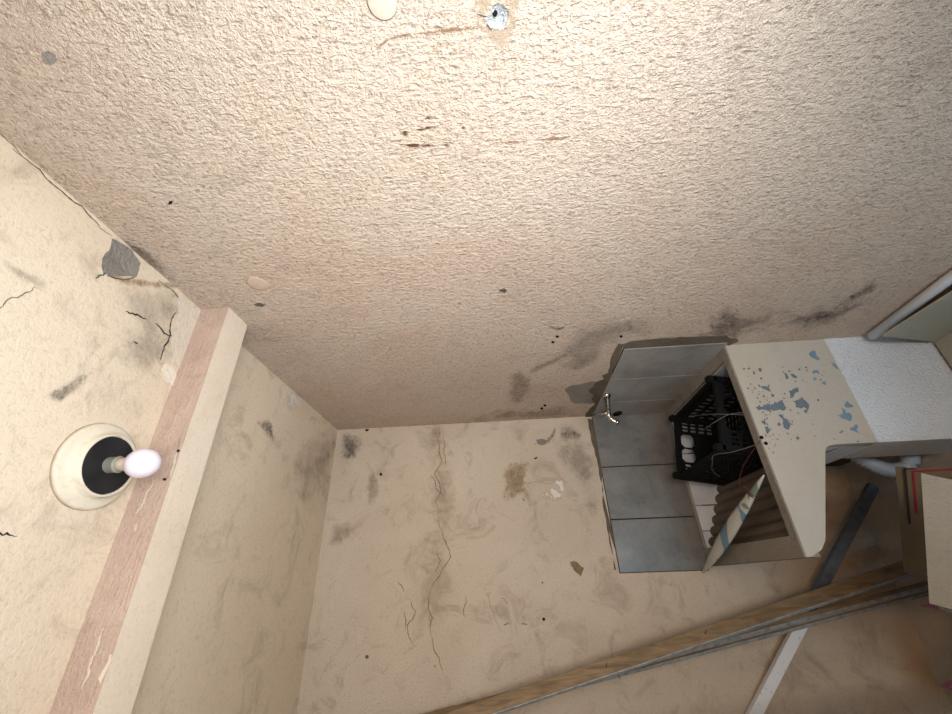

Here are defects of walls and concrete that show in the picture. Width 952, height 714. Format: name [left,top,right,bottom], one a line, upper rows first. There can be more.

spalling [487,3,509,29]
crack [0,133,112,236]
spalling [102,239,141,277]
crack [126,280,195,360]
crack [398,432,451,669]